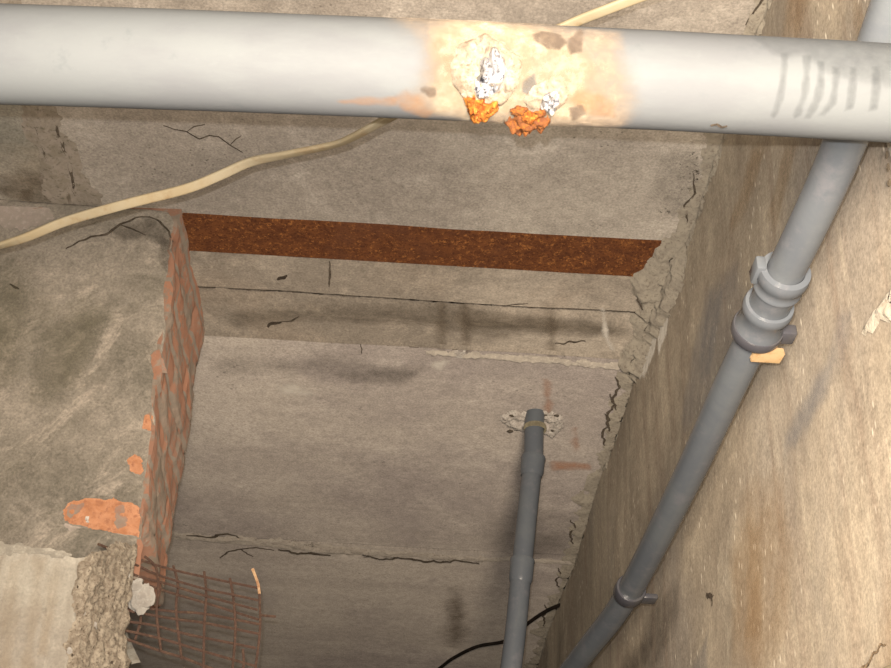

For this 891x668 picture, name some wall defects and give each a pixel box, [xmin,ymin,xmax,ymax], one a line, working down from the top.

peeling [0,206,54,231]
crack [66,216,173,249]
spalling [862,289,891,336]
crack [220,547,274,558]
spalling [63,497,151,668]